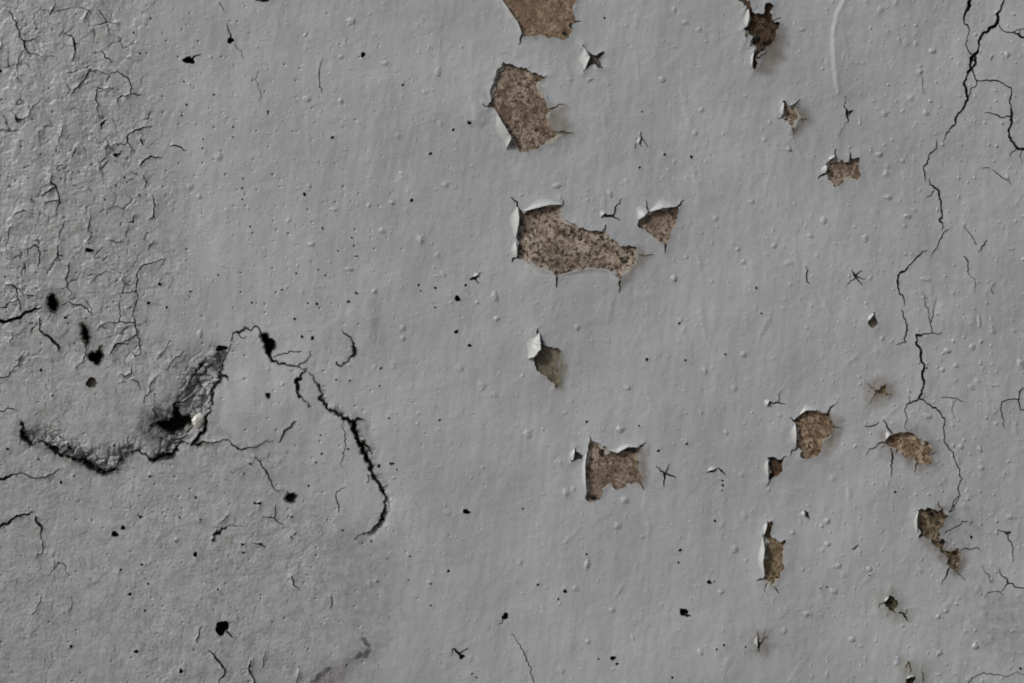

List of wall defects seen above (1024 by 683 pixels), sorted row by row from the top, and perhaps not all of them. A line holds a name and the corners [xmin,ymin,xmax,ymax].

peeling [500,0,580,44]
peeling [739,0,781,69]
peeling [484,62,572,152]
crack [0,3,388,548]
peeling [510,197,684,293]
crack [896,0,1024,511]
spalling [79,322,104,388]
peeling [526,329,561,388]
peeling [570,436,646,502]
peeling [763,404,841,486]
peeling [757,521,786,593]
peeling [913,496,980,585]